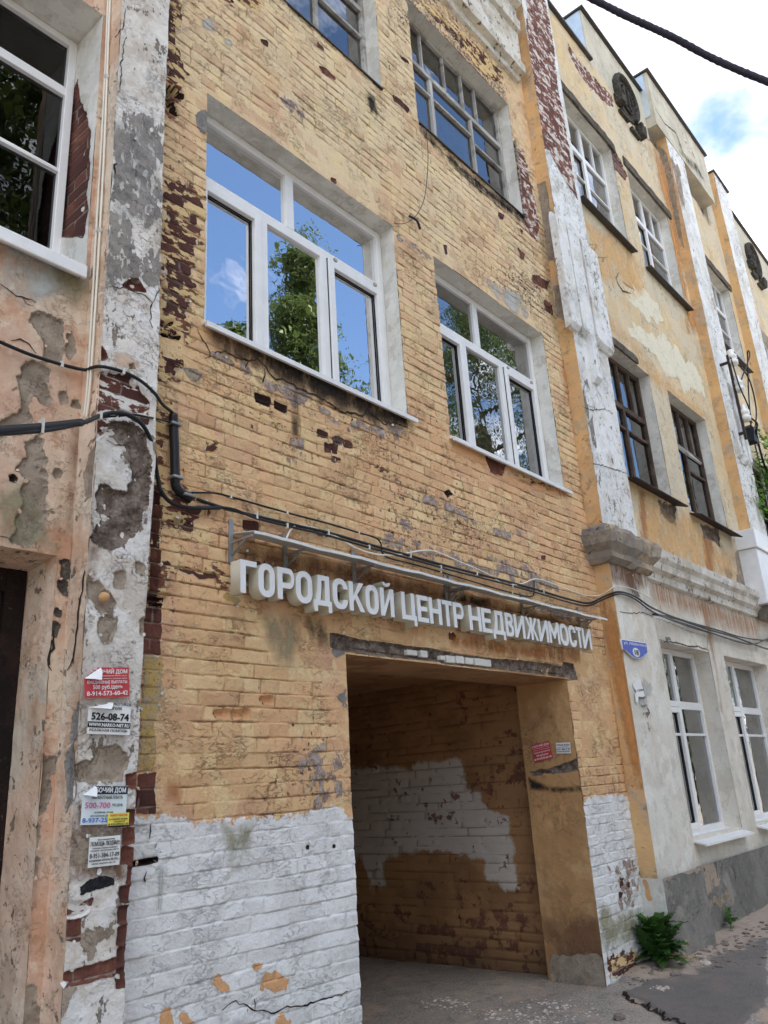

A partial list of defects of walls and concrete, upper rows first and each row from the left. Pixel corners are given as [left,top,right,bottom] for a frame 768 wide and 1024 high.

crack [115,9,127,93]
flaking render [526,0,578,200]
flaking render [568,44,615,107]
flaking render [62,79,91,238]
flaking render [106,0,208,345]
spalling [0,310,81,548]
peeling [253,380,405,465]
spalling [34,342,252,1018]
peeling [607,859,652,910]
peeling [159,1007,194,1024]
peeling [252,963,289,993]
crack [222,991,348,1014]